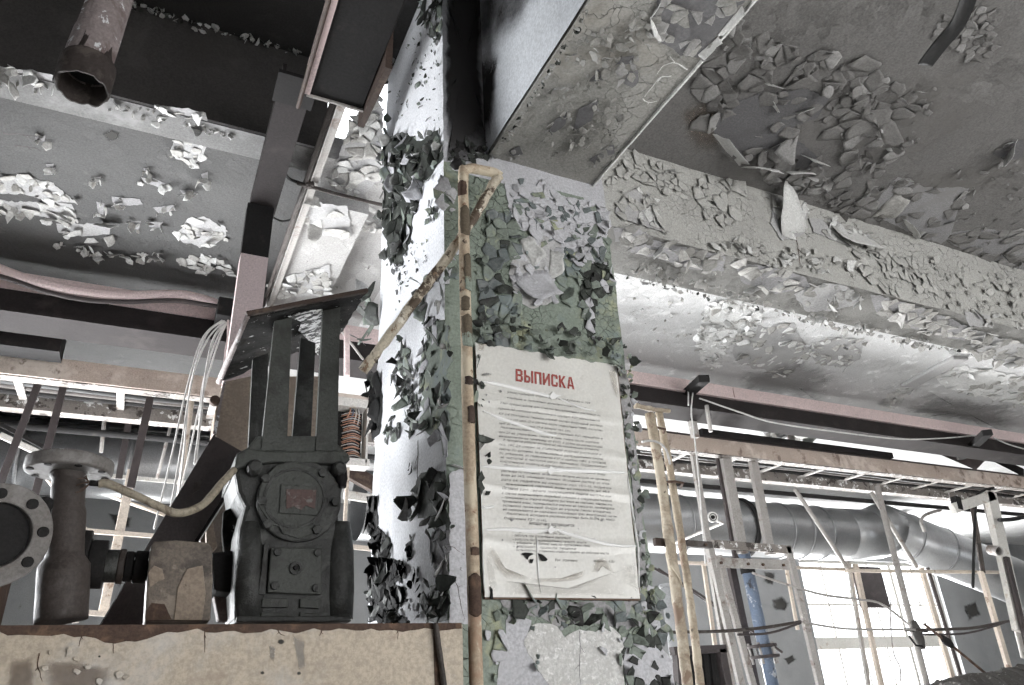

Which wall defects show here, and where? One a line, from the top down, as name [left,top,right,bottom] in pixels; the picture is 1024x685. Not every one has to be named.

peeling [0,64,54,100]
crack [643,59,688,104]
spalling [0,101,237,277]
peeling [266,265,338,300]
peeling [296,0,1024,685]